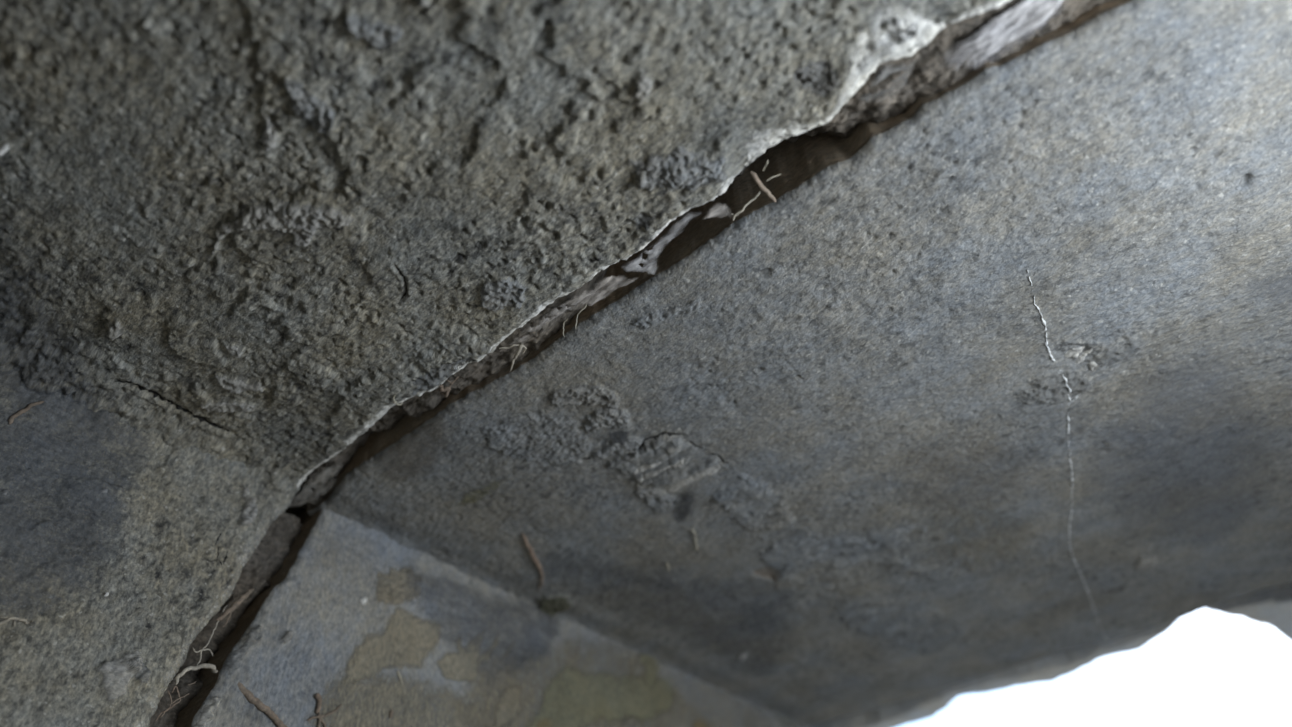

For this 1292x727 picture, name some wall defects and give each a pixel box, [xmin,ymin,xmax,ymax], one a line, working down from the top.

crack [115,380,229,431]
crack [583,432,729,463]
crack [1027,270,1114,654]